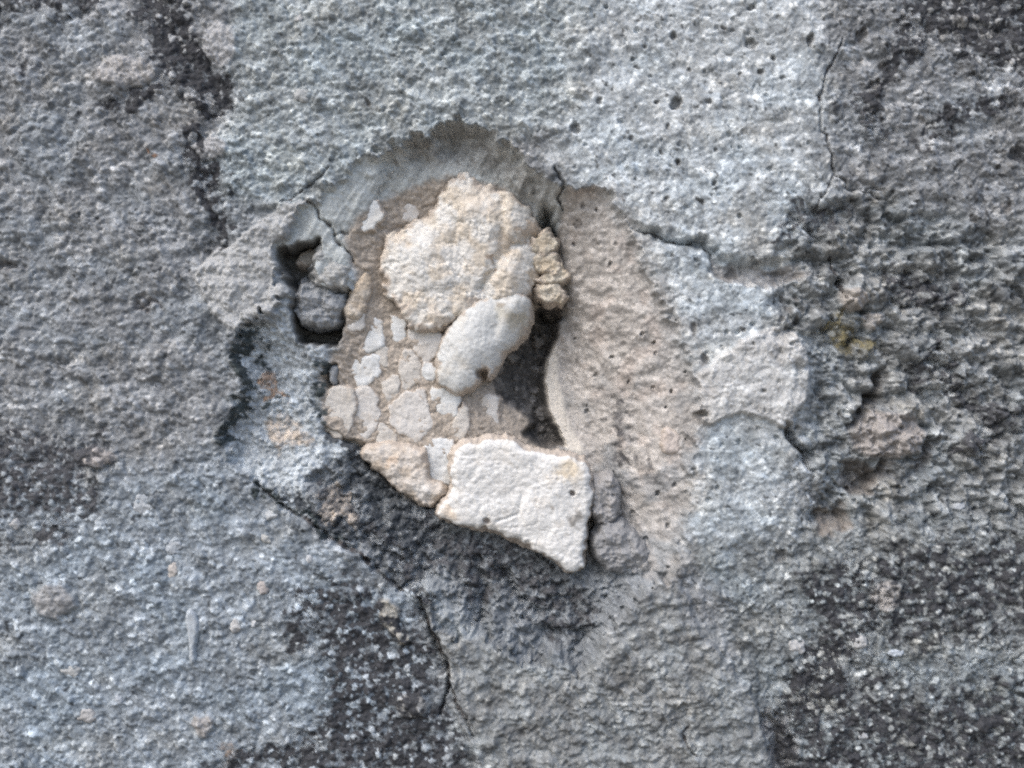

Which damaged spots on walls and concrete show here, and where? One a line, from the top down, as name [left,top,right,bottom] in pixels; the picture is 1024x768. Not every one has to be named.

crack [264,490,470,729]
spalling [193,116,812,768]